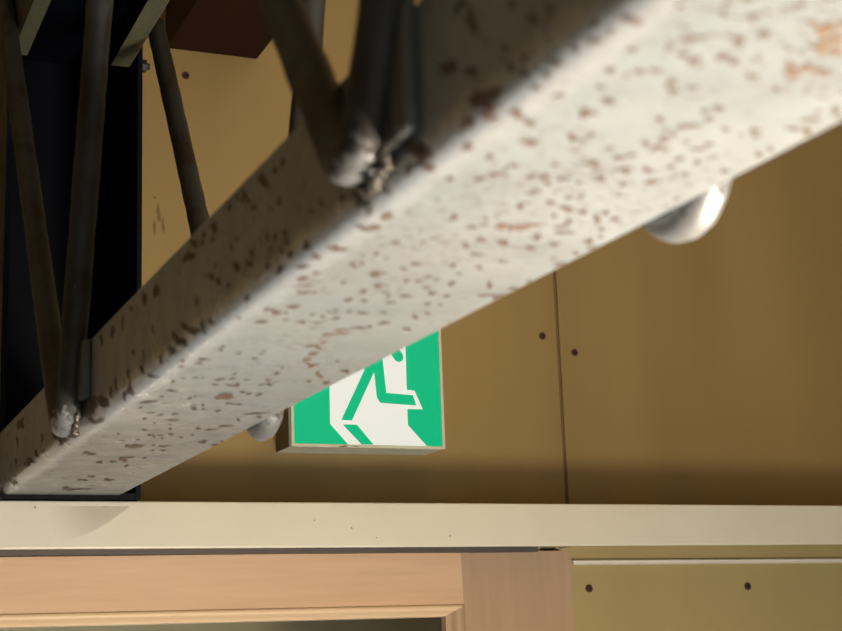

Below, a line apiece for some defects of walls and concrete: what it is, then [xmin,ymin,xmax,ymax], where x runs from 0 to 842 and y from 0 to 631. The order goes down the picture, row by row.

corrosion [784,48,831,79]
corrosion [402,137,436,176]
corrosion [459,86,503,134]
corrosion [510,107,536,128]
corrosion [642,106,725,175]
corrosion [339,189,393,232]
corrosion [467,216,541,251]
corrosion [547,195,621,256]
corrosion [294,241,322,295]
corrosion [297,271,411,385]
corrosion [83,317,283,467]
corrosion [41,433,69,446]